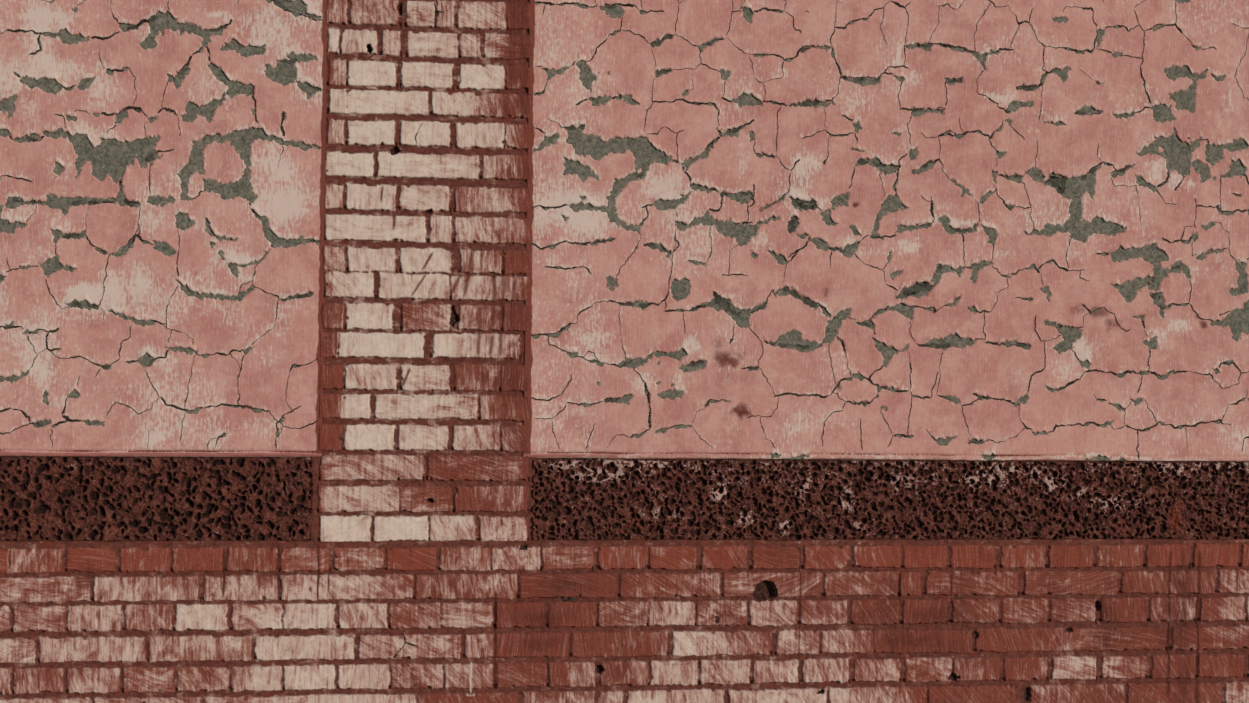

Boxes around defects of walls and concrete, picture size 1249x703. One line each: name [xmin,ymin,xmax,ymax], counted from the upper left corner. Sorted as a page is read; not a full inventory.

crack [29,34,42,55]
crack [99,54,181,138]
crack [535,0,1249,194]
peeling [0,0,322,345]
crack [530,231,706,278]
peeling [531,38,1249,448]
crack [0,207,318,449]
crack [531,306,592,339]
peeling [62,375,81,415]
crack [741,338,1249,462]
peeling [926,427,1026,460]
peeling [1085,451,1126,461]